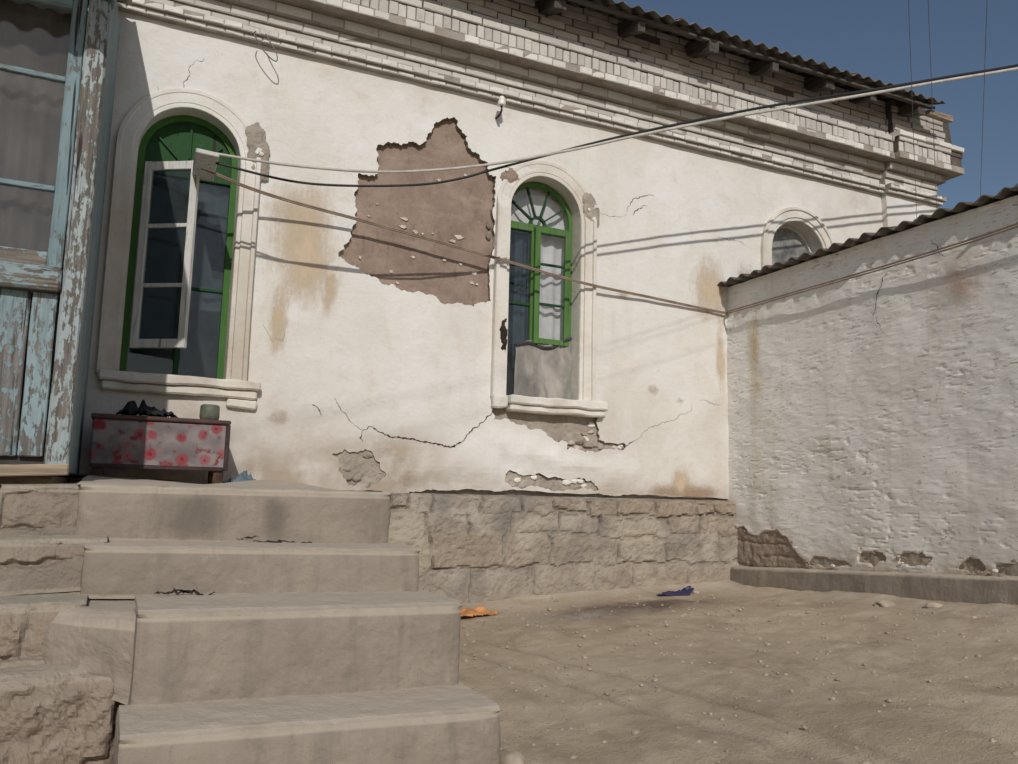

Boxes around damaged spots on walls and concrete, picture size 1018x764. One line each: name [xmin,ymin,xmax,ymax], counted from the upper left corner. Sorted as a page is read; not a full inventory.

flaking render [245,122,270,181]
flaking render [338,119,519,306]
crack [314,399,493,448]
flaking render [492,408,624,452]
flaking render [332,449,385,491]
flaking render [505,470,597,495]
flaking render [735,524,932,569]
flaking render [959,556,1018,577]